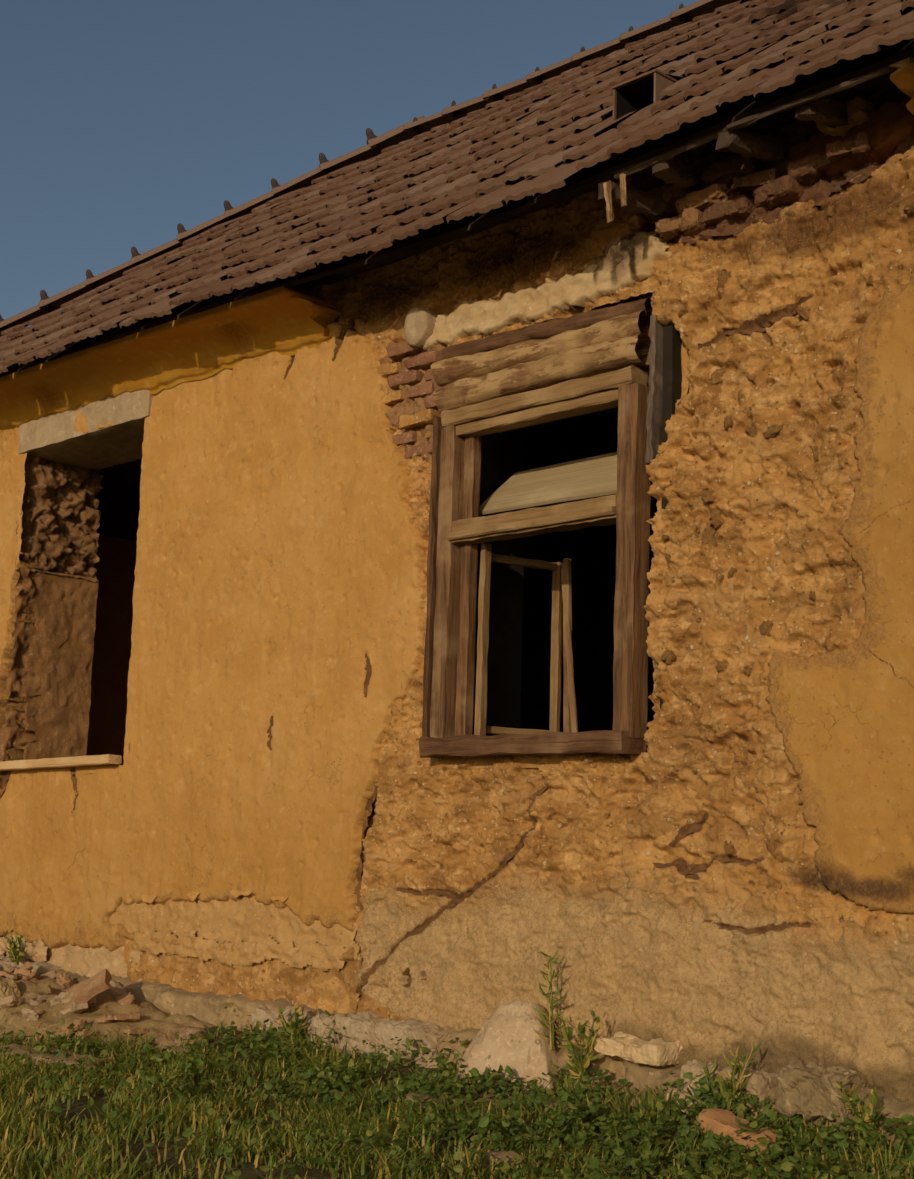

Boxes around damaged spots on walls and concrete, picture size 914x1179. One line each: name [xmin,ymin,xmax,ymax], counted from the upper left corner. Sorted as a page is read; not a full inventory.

crack [332,318,356,361]
crack [283,355,295,380]
spalling [44,118,914,1103]
crack [363,653,372,697]
crack [266,716,274,751]
crack [0,772,9,797]
crack [70,768,78,813]
crack [653,813,764,880]
crack [354,785,548,1001]
leakage [802,868,914,898]
crack [703,919,811,935]
leakage [359,887,914,1103]